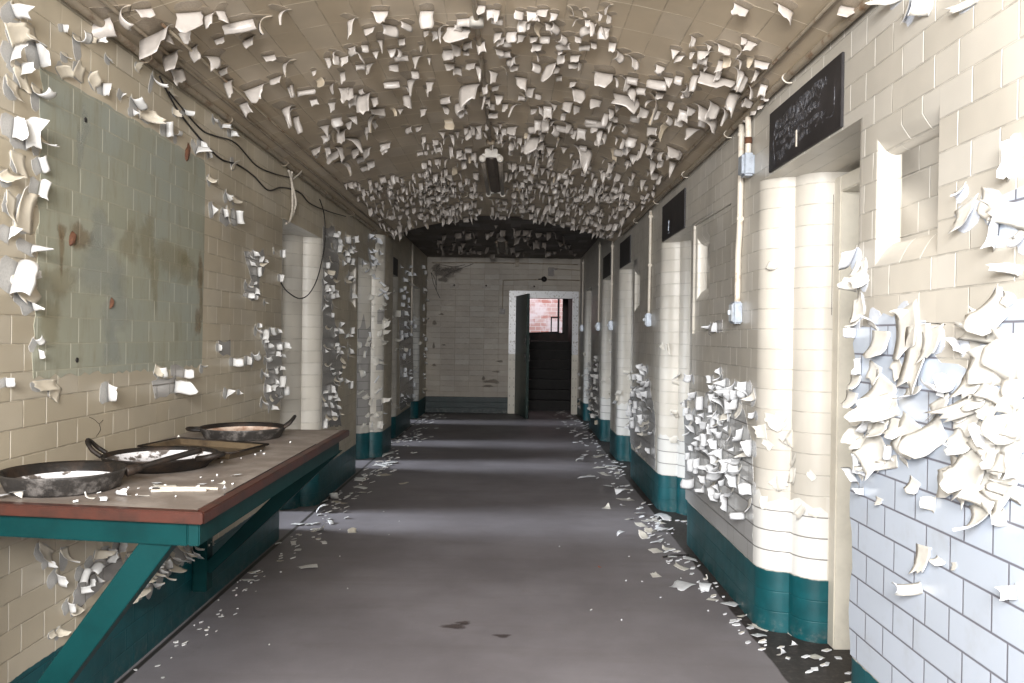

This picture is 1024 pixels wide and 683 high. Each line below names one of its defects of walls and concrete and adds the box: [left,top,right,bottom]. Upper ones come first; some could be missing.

peeling [773,0,798,26]
peeling [0,0,772,431]
peeling [34,541,133,641]
peeling [133,542,215,604]
peeling [577,339,828,580]
peeling [837,245,1024,683]